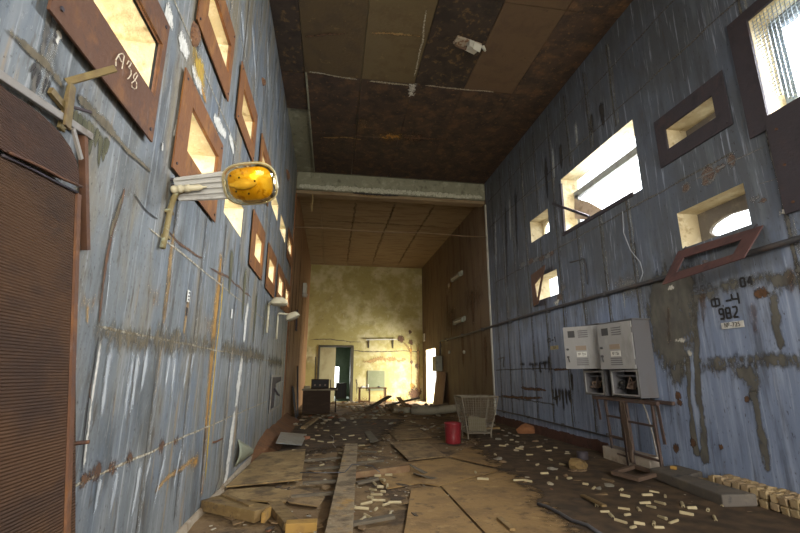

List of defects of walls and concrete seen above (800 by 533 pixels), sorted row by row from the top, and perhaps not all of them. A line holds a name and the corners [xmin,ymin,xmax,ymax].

leakage [100,296,282,415]
leakage [749,390,770,472]
corrosion [80,460,116,489]